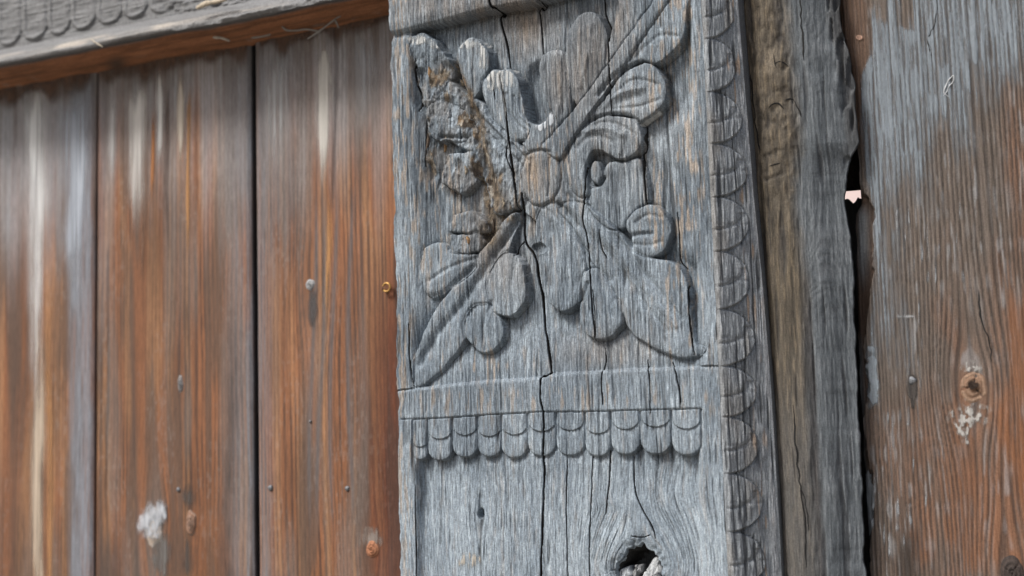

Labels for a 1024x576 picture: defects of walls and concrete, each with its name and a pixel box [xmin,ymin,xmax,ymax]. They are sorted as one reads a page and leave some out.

crack [489,0,656,576]